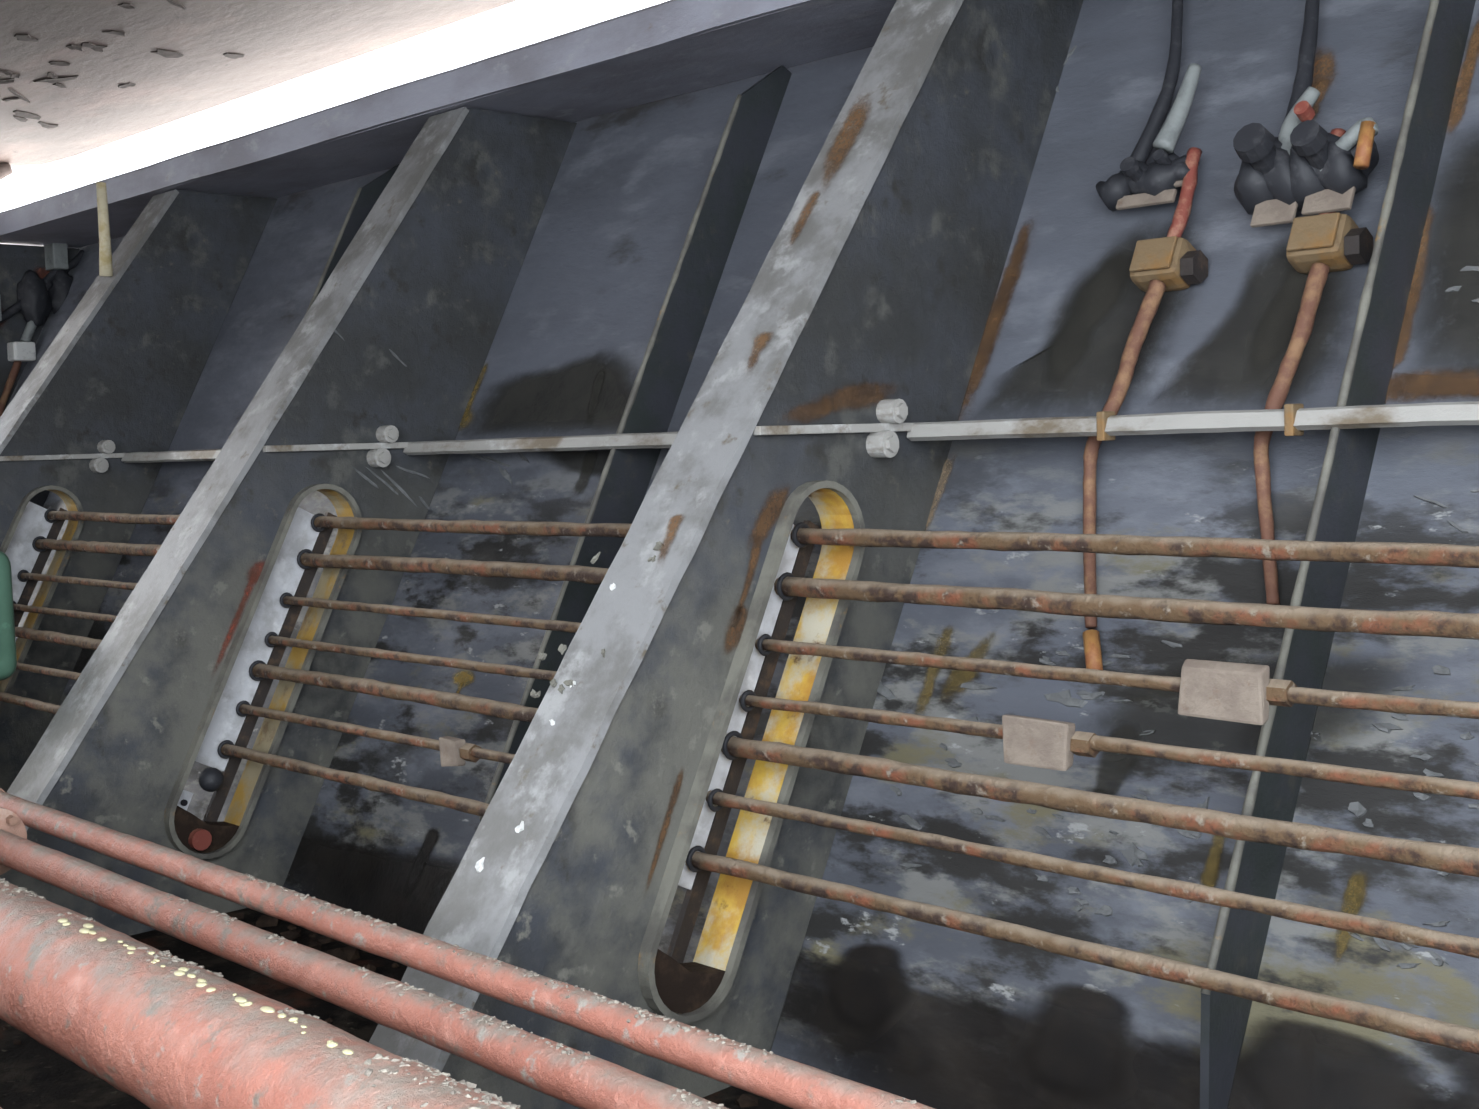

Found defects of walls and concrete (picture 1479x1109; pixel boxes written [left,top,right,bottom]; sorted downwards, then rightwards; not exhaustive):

peeling [0,30,126,129]
peeling [151,48,184,58]
corrosion [825,103,867,178]
corrosion [791,193,818,241]
corrosion [962,226,1027,405]
corrosion [1386,209,1479,400]
peeling [1445,266,1479,303]
corrosion [660,515,682,558]
corrosion [726,489,788,652]
water stain [1028,985,1130,1096]
water stain [1244,1021,1420,1109]
water stain [1451,1050,1479,1109]